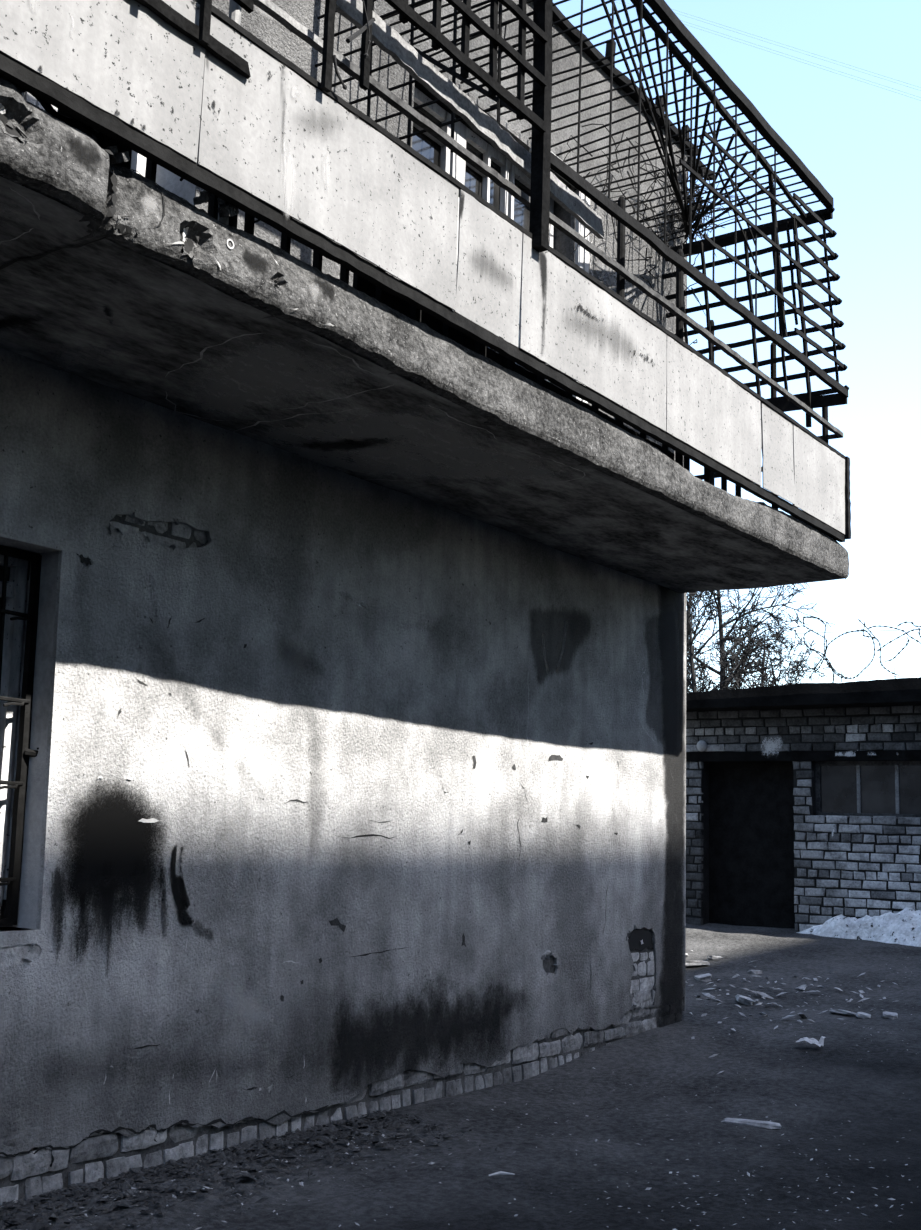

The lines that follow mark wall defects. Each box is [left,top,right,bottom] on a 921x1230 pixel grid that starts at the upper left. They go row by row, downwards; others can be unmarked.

spalling [0,103,27,142]
spalling [111,215,138,241]
spalling [182,221,211,269]